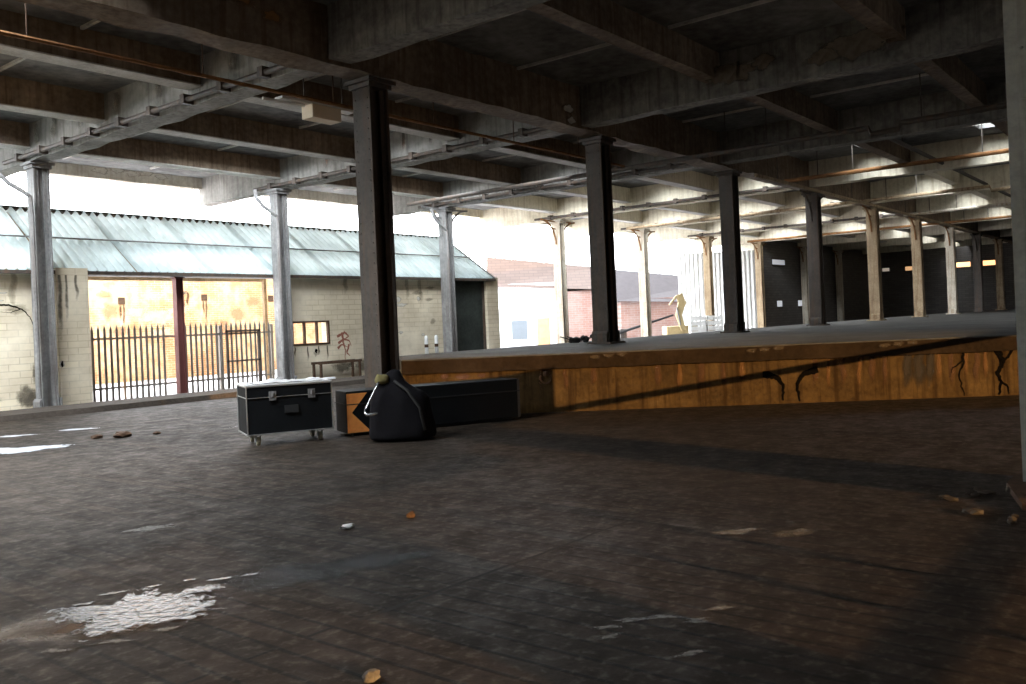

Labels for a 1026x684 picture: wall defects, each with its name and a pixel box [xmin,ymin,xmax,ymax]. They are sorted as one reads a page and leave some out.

crack [763,367,818,401]
crack [949,353,965,396]
crack [994,350,1013,395]